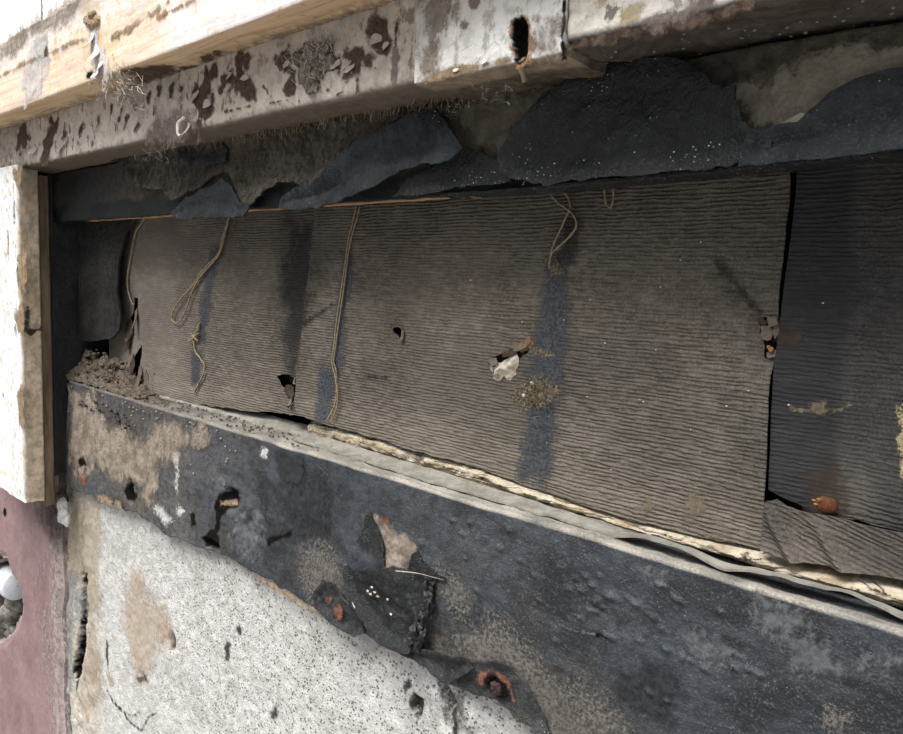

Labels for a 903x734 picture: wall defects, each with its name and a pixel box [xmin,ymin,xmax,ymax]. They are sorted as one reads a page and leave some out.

peeling [85,23,112,92]
peeling [180,51,256,145]
peeling [274,45,296,97]
peeling [330,15,392,83]
peeling [426,57,512,82]
peeling [13,112,68,194]
peeling [11,248,27,339]
water stain [283,230,311,369]
water stain [514,220,579,492]
peeling [17,384,25,429]
corrosion [327,597,343,620]
corrosion [476,669,515,702]